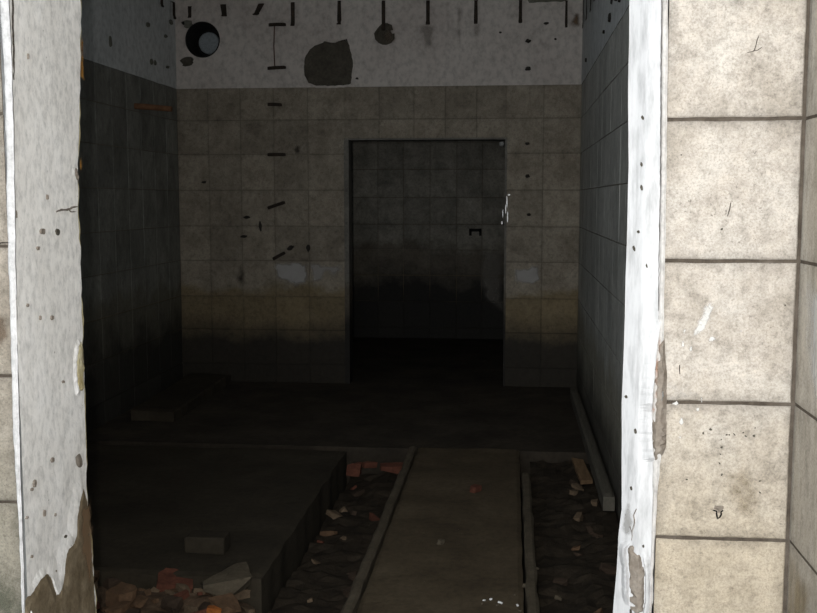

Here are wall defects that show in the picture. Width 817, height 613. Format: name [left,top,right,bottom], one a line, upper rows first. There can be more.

spalling [303,37,355,88]
spalling [62,298,86,430]
peeling [634,320,678,462]
peeling [25,442,97,613]
peeling [619,541,653,613]